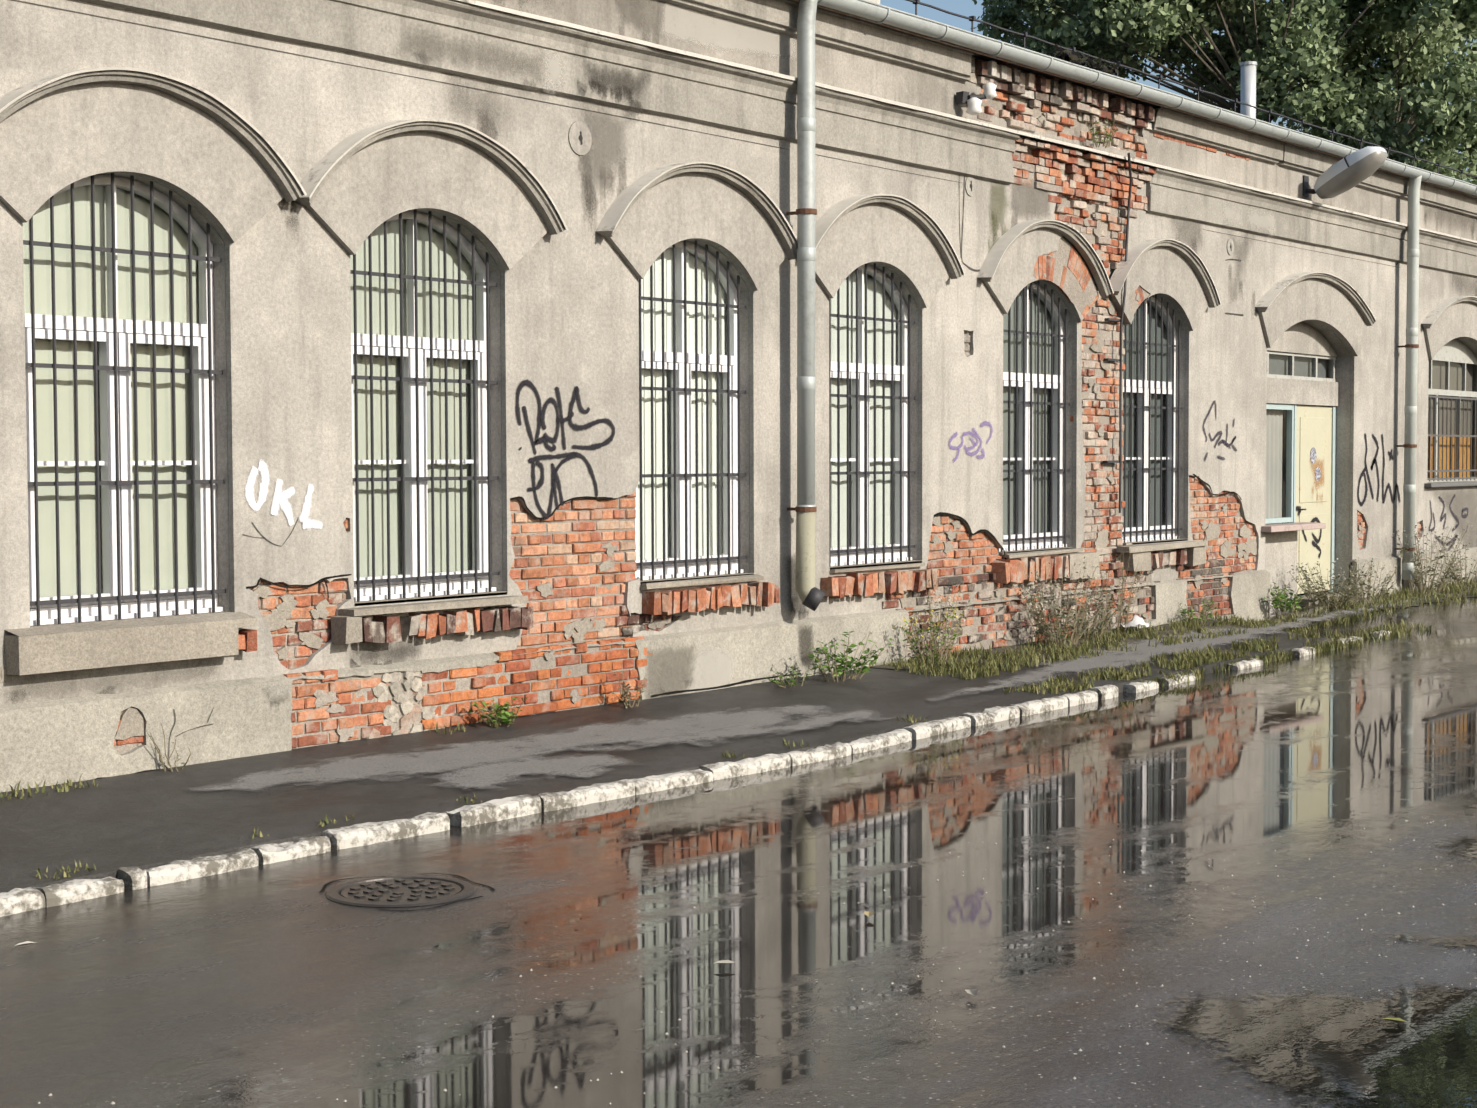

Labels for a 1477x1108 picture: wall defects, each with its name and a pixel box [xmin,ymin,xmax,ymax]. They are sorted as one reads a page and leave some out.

water stain [593,71,641,108]
flaking render [821,56,1257,657]
flaking render [238,489,780,749]